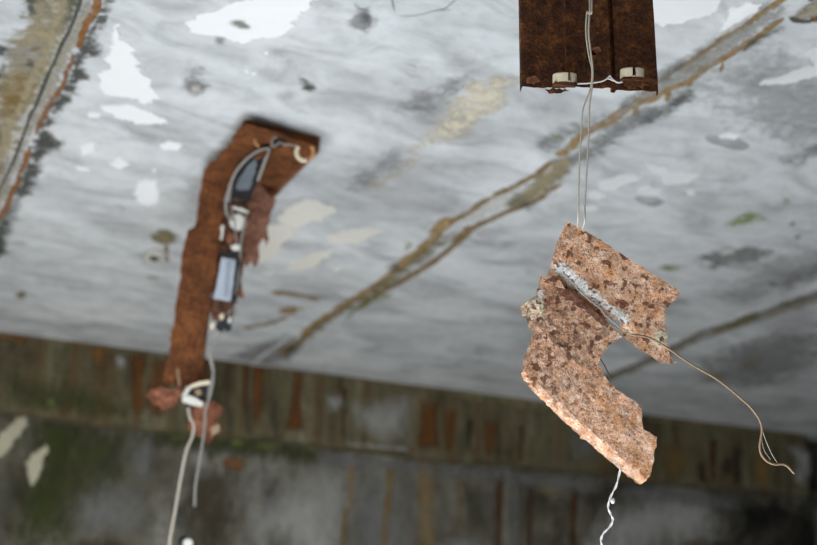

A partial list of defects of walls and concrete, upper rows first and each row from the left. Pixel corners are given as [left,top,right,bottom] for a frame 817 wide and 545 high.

peeling [185,0,312,44]
crack [391,0,455,17]
peeling [653,0,721,27]
rust [35,0,102,136]
peeling [88,23,171,125]
rust [0,147,31,219]
rust [278,0,786,356]
rust [246,291,319,330]
peeling [0,417,28,457]
peeling [26,444,48,486]
damp [173,472,231,542]
damp [448,468,736,545]